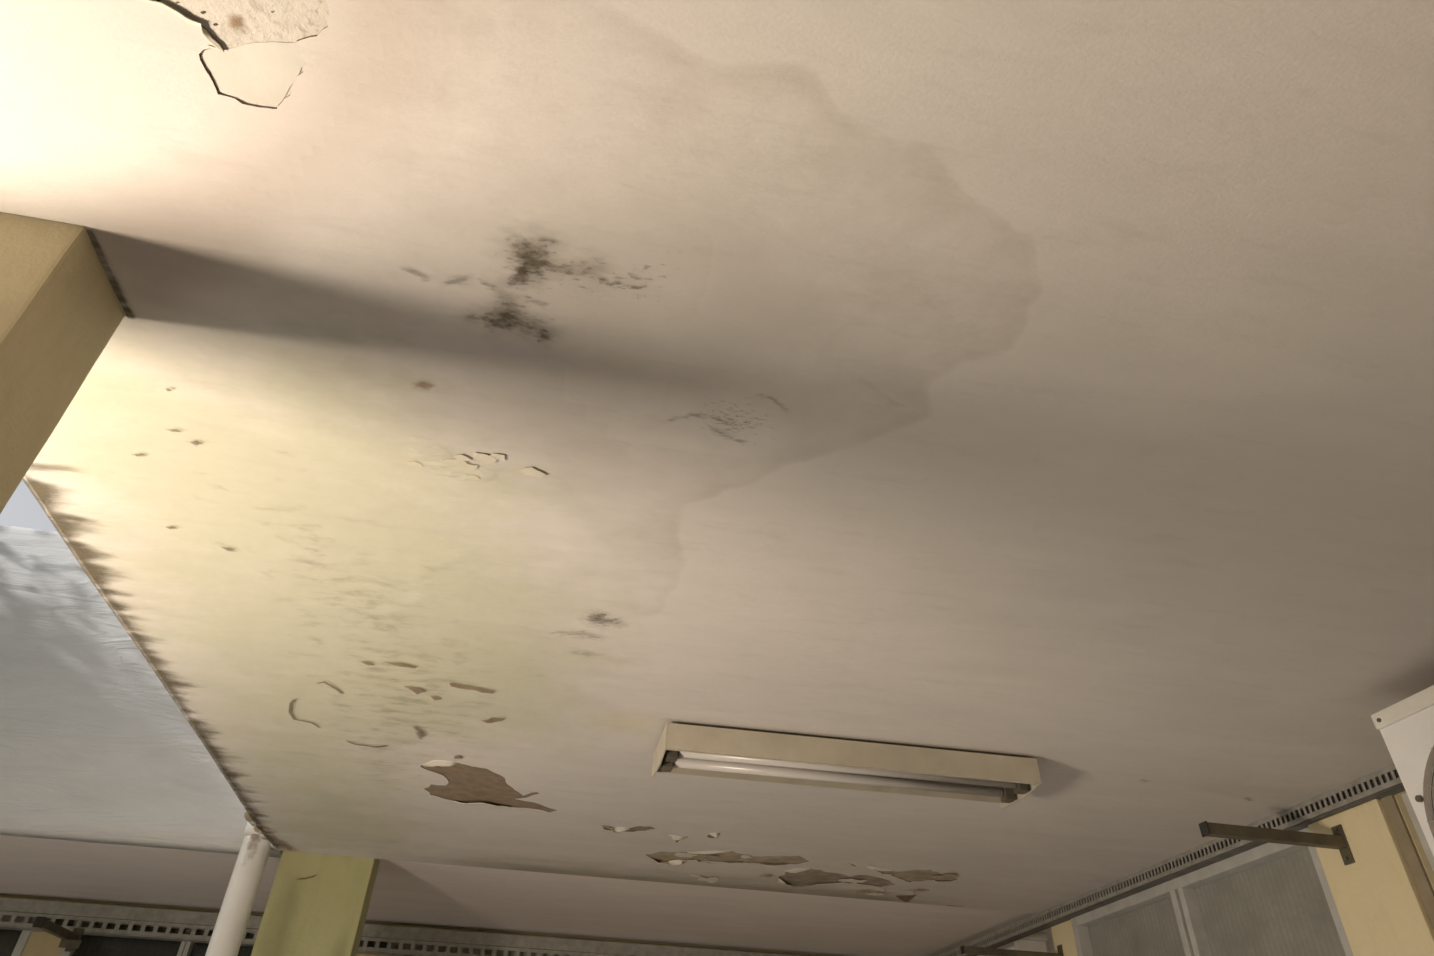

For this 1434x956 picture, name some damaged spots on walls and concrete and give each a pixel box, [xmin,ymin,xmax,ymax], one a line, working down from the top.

peeling [143,0,329,109]
water stain [91,233,134,318]
water stain [515,244,547,282]
water stain [22,465,281,847]
peeling [420,760,557,812]
peeling [602,825,958,902]